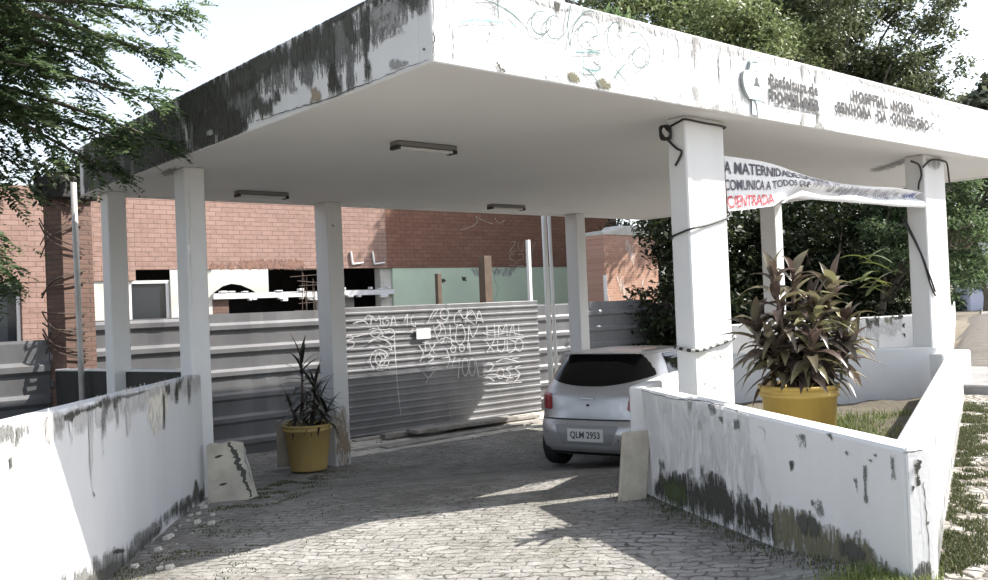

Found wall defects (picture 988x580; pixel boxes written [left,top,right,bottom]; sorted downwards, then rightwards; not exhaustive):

leakage [530,0,988,117]
leakage [829,314,903,348]
leakage [0,372,201,475]
crack [227,442,253,497]
leakage [53,479,205,580]